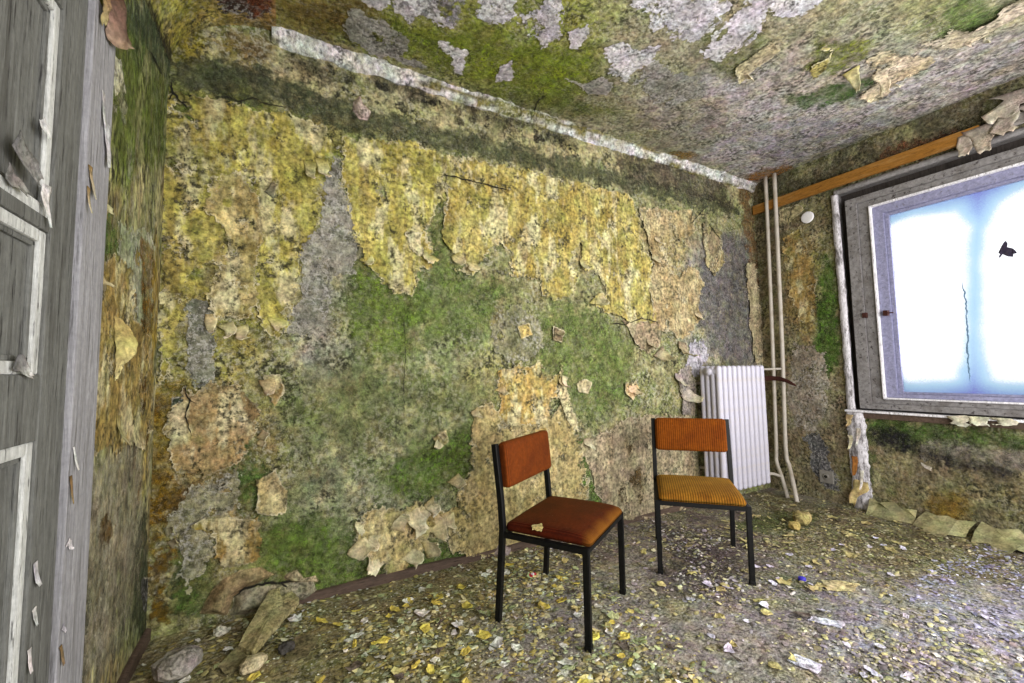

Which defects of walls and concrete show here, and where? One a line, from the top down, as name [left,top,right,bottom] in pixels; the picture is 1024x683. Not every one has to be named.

damp [126,0,740,219]
flaking render [339,0,590,75]
flaking render [495,60,515,82]
flaking render [565,0,823,109]
peeling [842,0,1024,103]
peeling [956,88,1024,157]
crack [439,174,511,191]
flaking render [268,146,374,337]
flaking render [786,342,869,506]
damp [868,427,1024,478]
flaking render [163,467,242,597]
peeling [347,496,457,577]